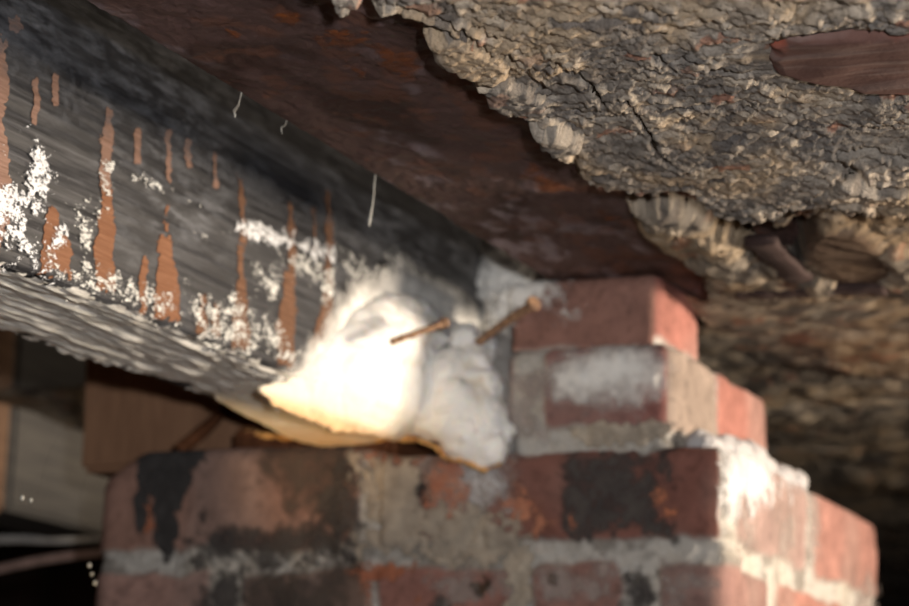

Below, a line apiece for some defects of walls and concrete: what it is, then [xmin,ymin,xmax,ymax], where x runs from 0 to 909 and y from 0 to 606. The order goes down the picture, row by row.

damp [0,139,400,396]
damp [133,467,193,564]